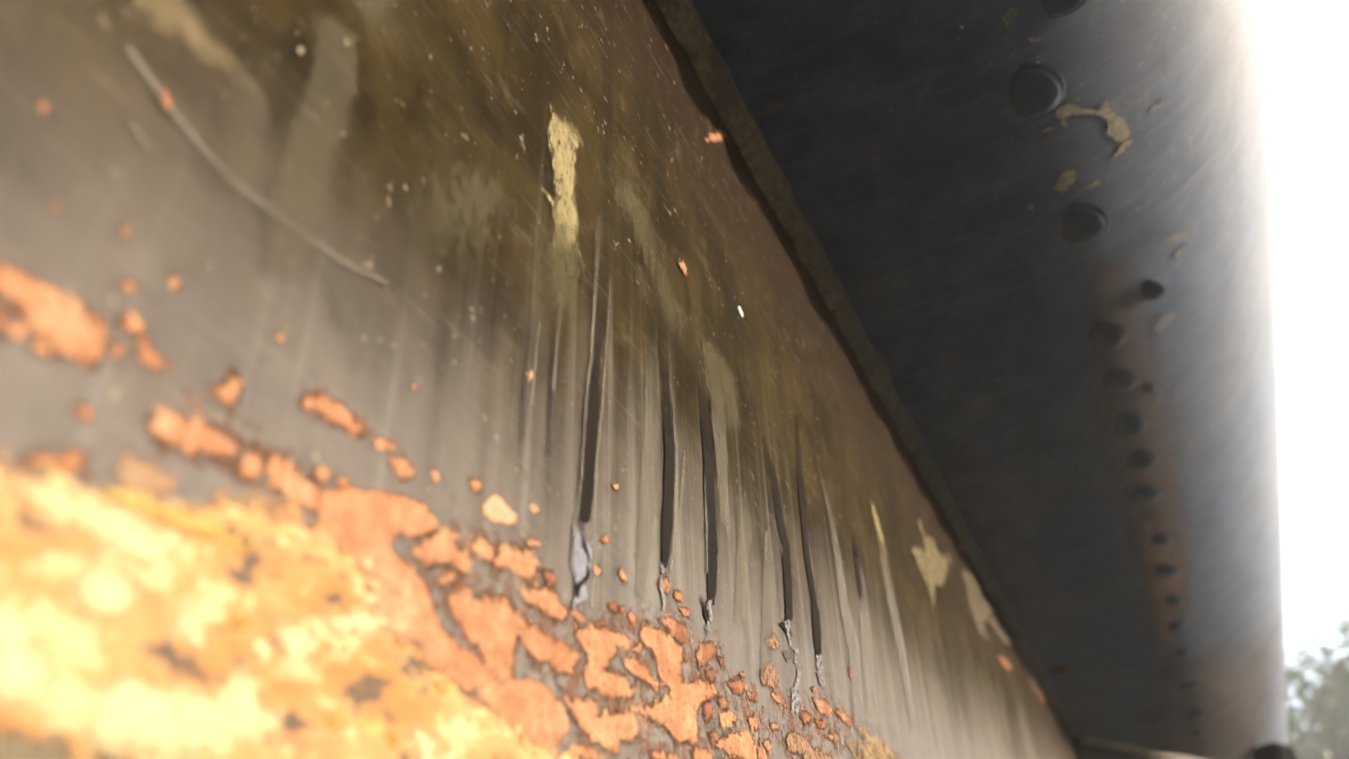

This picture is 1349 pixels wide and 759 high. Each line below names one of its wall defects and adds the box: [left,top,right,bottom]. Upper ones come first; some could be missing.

corrosion [0,262,175,373]
corrosion [168,273,182,290]
peeling [0,449,578,759]
peeling [296,386,442,482]
leakage [571,334,602,610]
leakage [660,378,675,610]
leakage [699,385,718,634]
leakage [768,446,824,714]
leakage [871,502,884,548]
peeling [841,720,904,759]